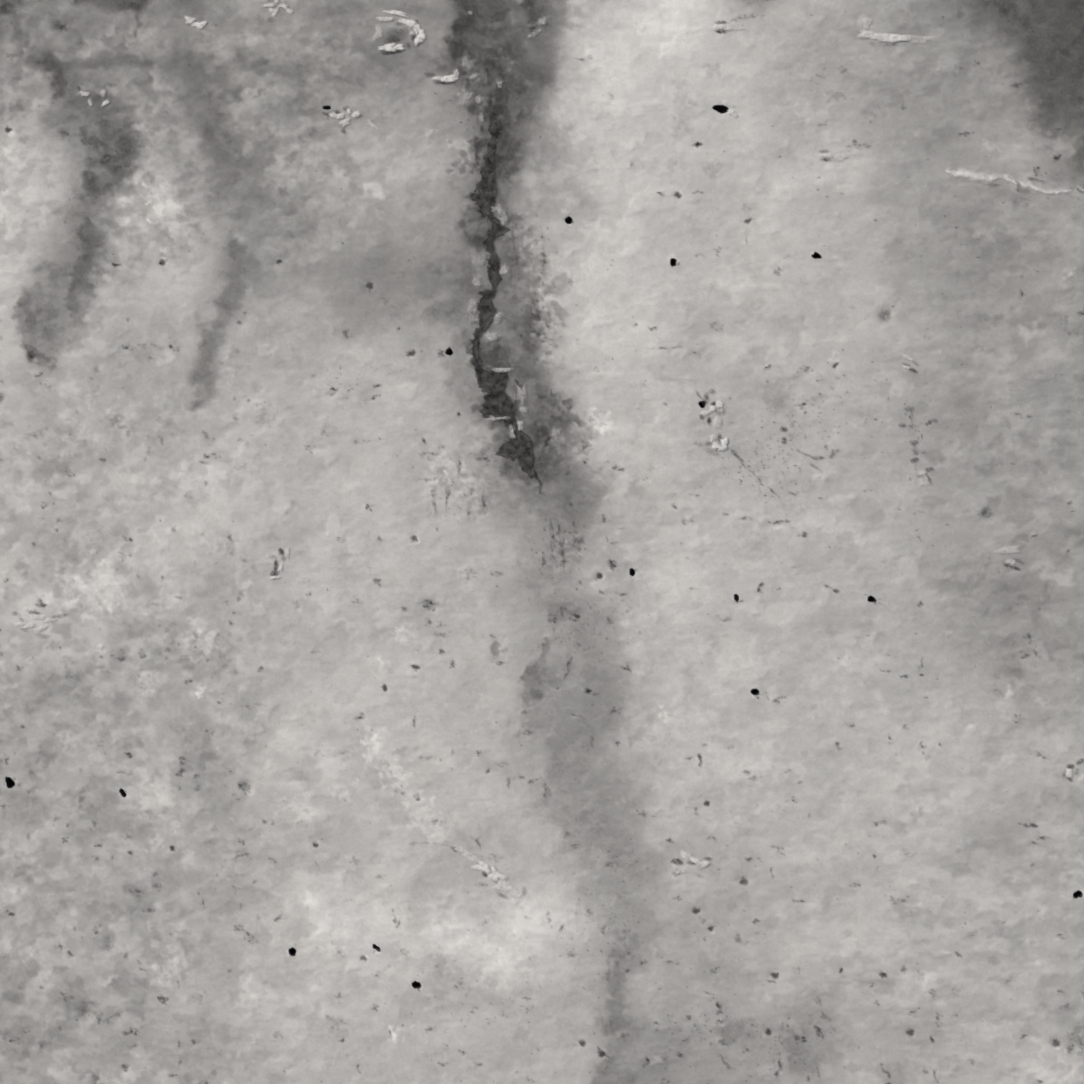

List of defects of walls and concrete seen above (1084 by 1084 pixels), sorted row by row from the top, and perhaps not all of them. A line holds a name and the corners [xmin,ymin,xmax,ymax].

crack [463,59,559,493]